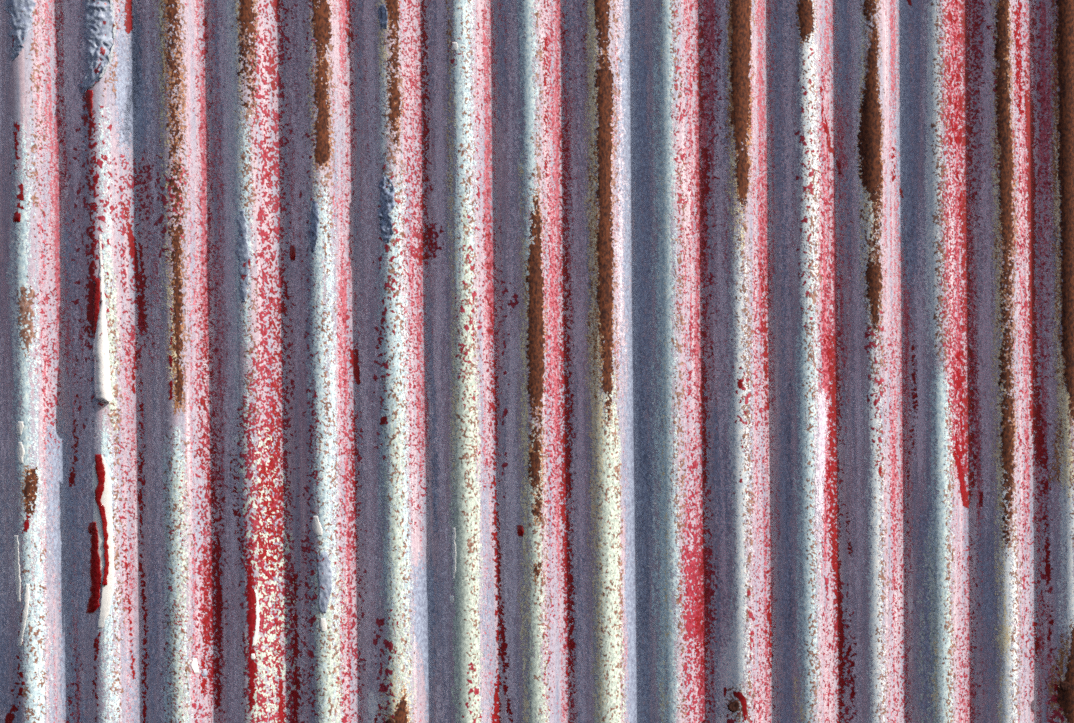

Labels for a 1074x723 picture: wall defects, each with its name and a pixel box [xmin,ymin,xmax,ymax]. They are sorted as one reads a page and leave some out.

rust [303,0,347,721]
rust [373,0,417,723]
peeling [372,0,444,723]
peeling [452,0,519,723]
rust [516,0,554,723]
rust [582,0,626,723]
rust [717,0,759,723]
rust [791,0,823,723]
rust [853,0,889,394]
rust [989,0,1024,723]
rust [1045,619,1074,723]
rust [1048,0,1074,548]